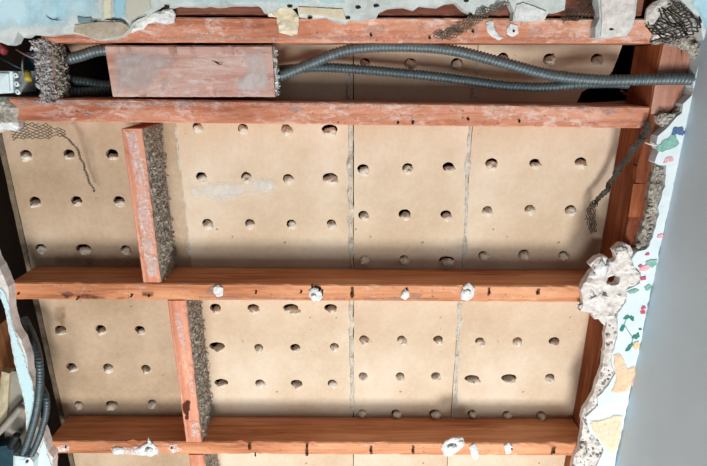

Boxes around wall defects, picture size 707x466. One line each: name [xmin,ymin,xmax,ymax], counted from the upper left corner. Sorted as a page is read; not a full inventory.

spalling [131,5,176,40]
spalling [486,20,571,41]
spalling [644,0,701,60]
peeling [0,37,71,133]
spalling [654,106,681,128]
spalling [570,162,665,466]